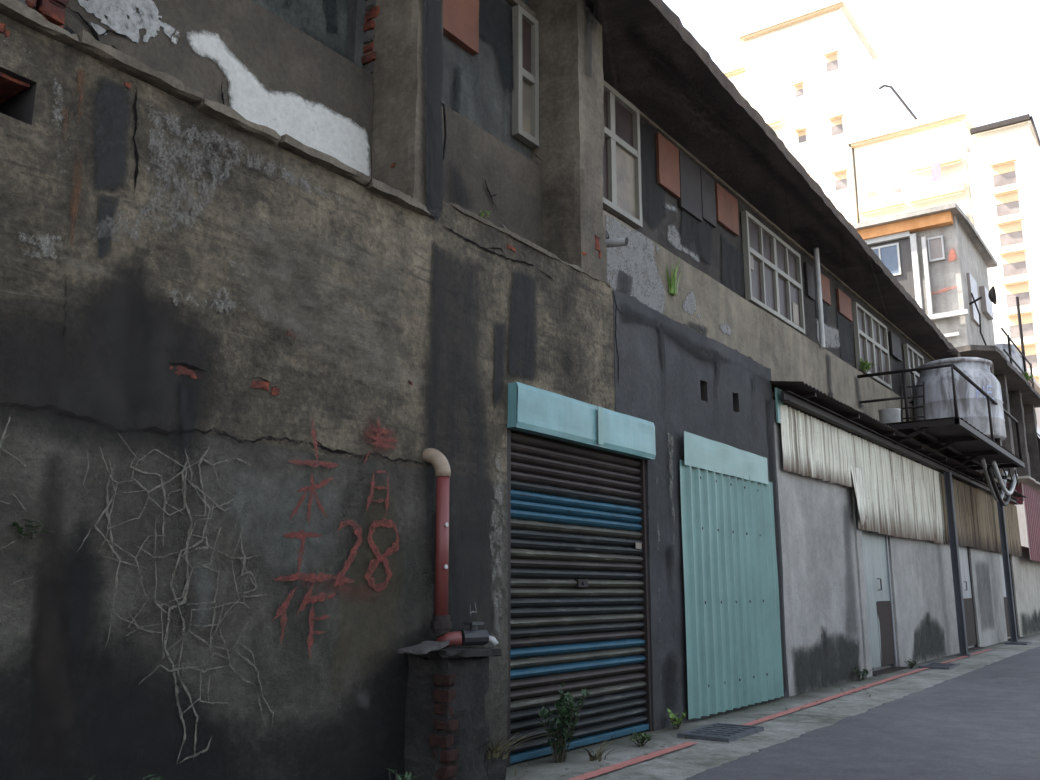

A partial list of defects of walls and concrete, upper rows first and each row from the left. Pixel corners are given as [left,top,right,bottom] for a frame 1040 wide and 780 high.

peeling [16,0,176,44]
flaking render [361,0,380,74]
crack [133,87,143,193]
peeling [189,32,370,176]
damp [20,233,61,258]
peeling [582,215,699,314]
damp [495,271,537,407]
damp [618,270,727,398]
crack [0,393,427,765]
damp [0,249,504,780]
damp [766,401,861,695]
damp [913,614,946,663]